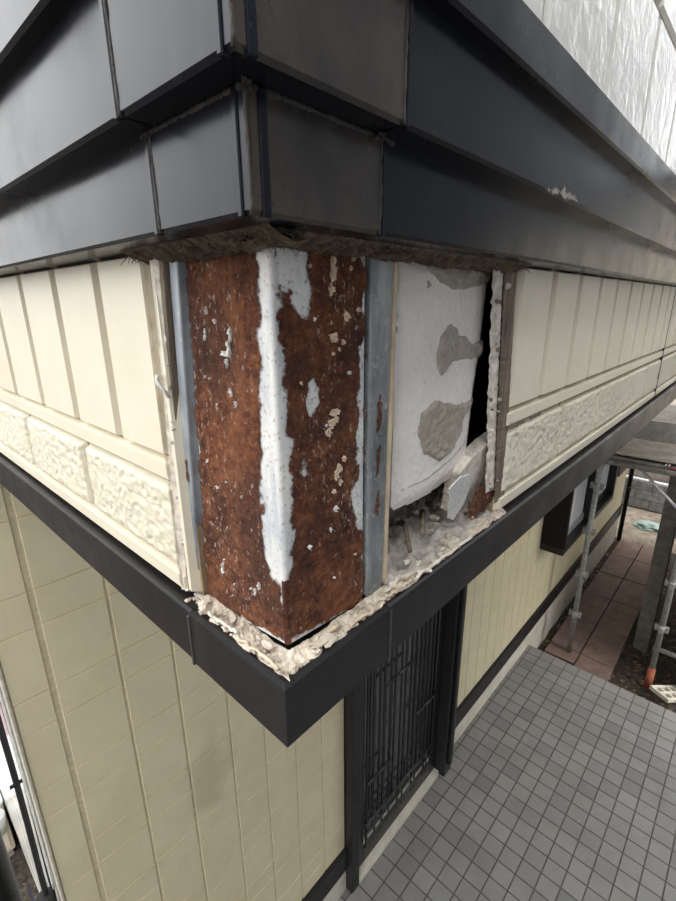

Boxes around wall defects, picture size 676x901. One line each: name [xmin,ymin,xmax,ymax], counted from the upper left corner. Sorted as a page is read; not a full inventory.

corrosion [185,250,382,645]
spalling [150,255,541,681]